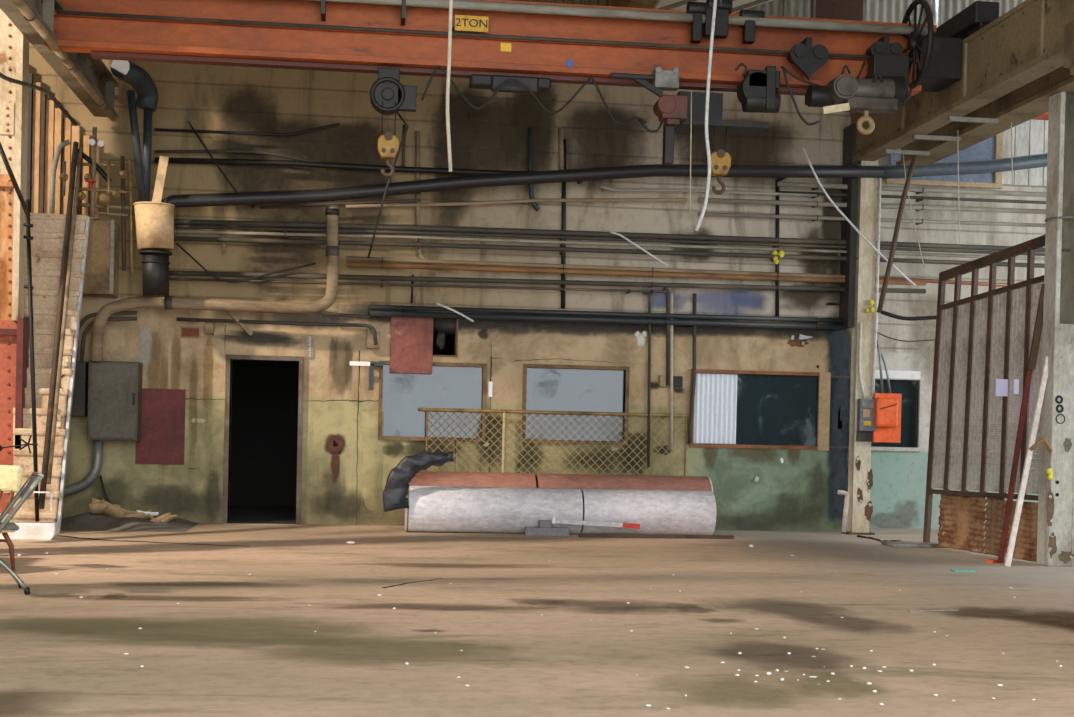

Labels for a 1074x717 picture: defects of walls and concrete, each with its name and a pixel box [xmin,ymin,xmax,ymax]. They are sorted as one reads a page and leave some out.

water stain [435,88,555,226]
water stain [568,109,642,181]
peeling [855,456,873,521]